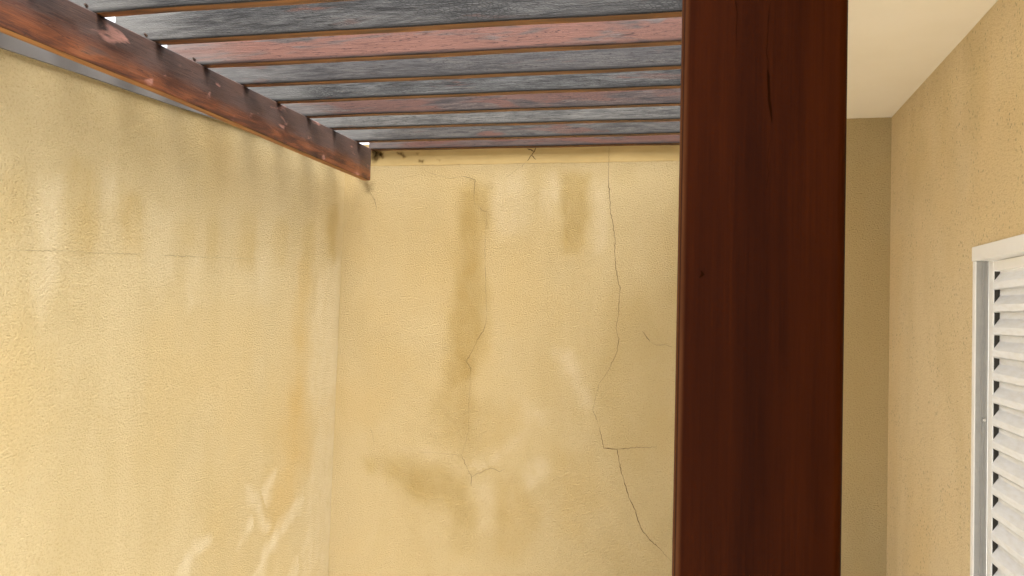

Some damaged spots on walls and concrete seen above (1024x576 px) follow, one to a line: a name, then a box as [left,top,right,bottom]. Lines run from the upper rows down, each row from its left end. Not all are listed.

water stain [385,341,602,544]
crack [593,164,671,555]